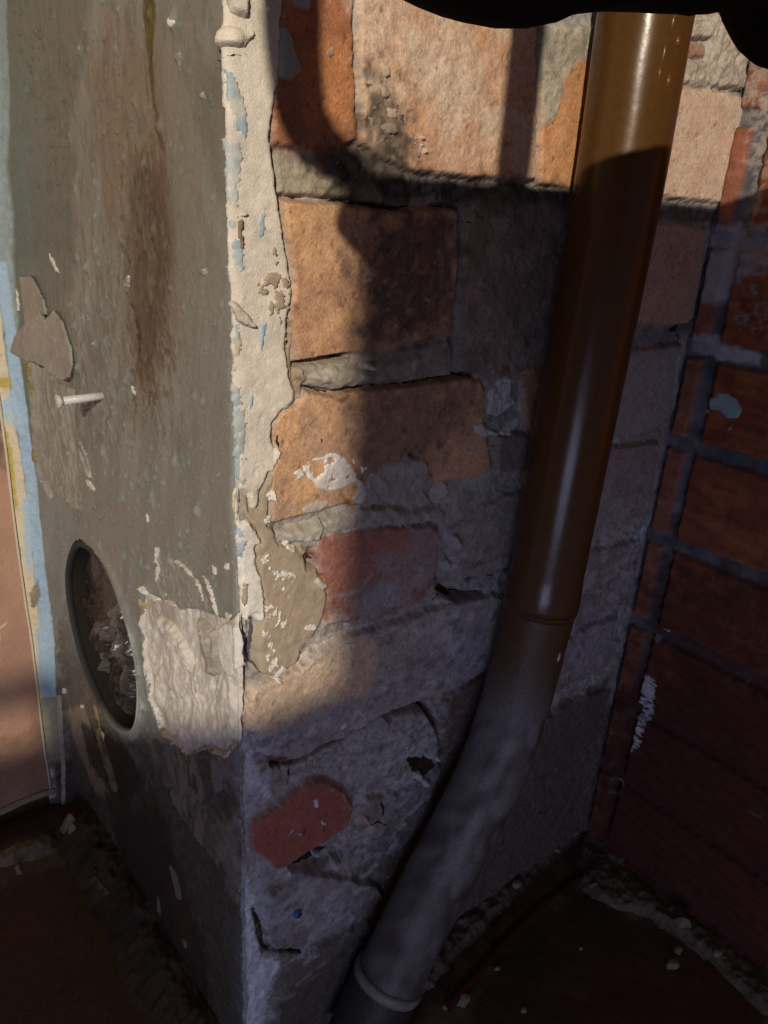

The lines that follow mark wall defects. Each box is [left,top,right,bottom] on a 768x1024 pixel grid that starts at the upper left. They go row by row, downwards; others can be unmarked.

water stain [143,0,157,116]
flaking render [10,276,95,512]
flaking render [136,0,328,759]